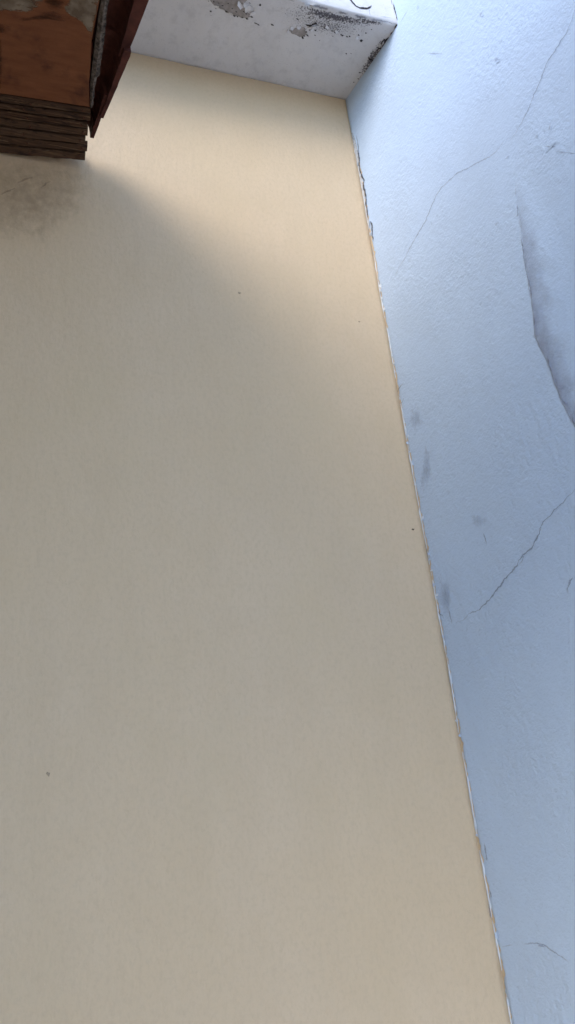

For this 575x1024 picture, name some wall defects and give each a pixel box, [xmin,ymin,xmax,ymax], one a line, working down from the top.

water stain [282,5,380,34]
crack [484,497,568,605]